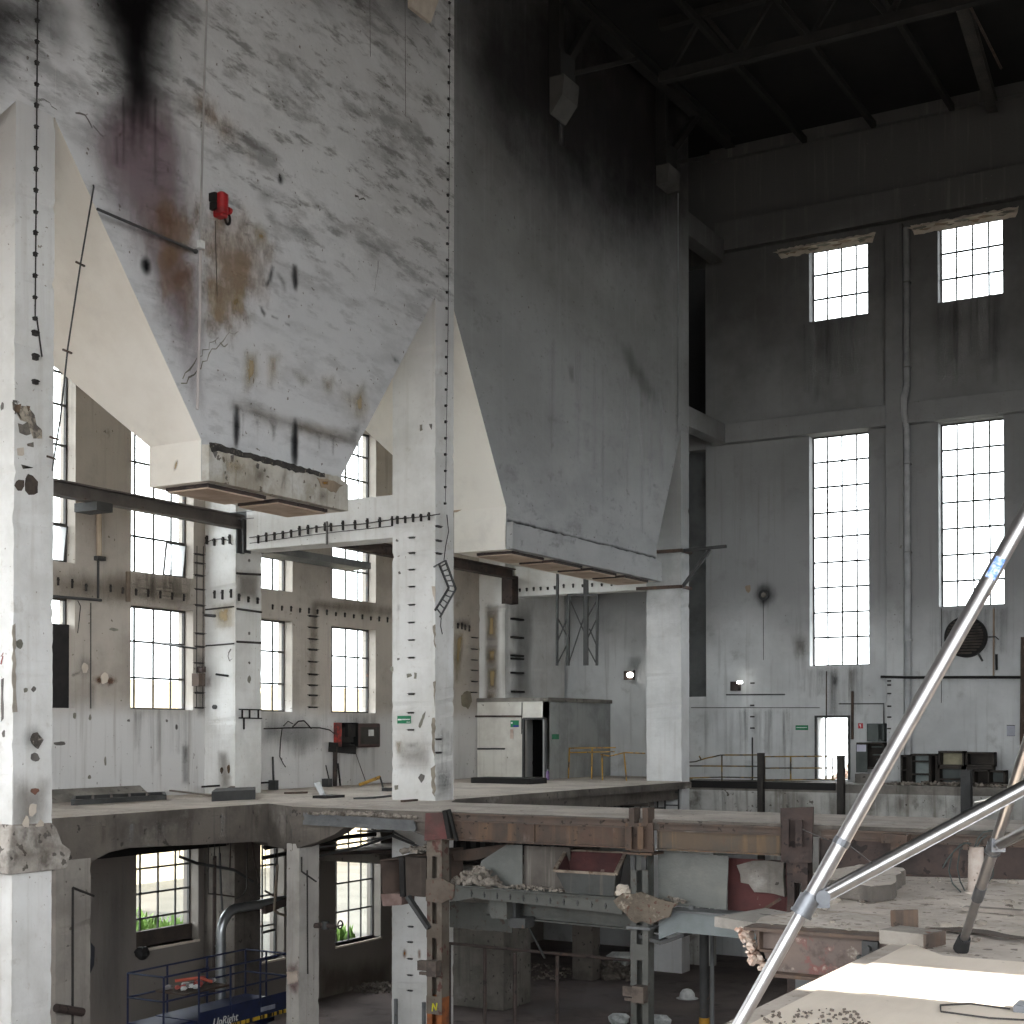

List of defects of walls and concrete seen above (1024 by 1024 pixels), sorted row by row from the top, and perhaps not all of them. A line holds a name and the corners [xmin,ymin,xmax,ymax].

corrosion [209,232,254,323]
crack [181,331,238,384]
spalling [0,402,42,495]
spalling [209,442,343,493]